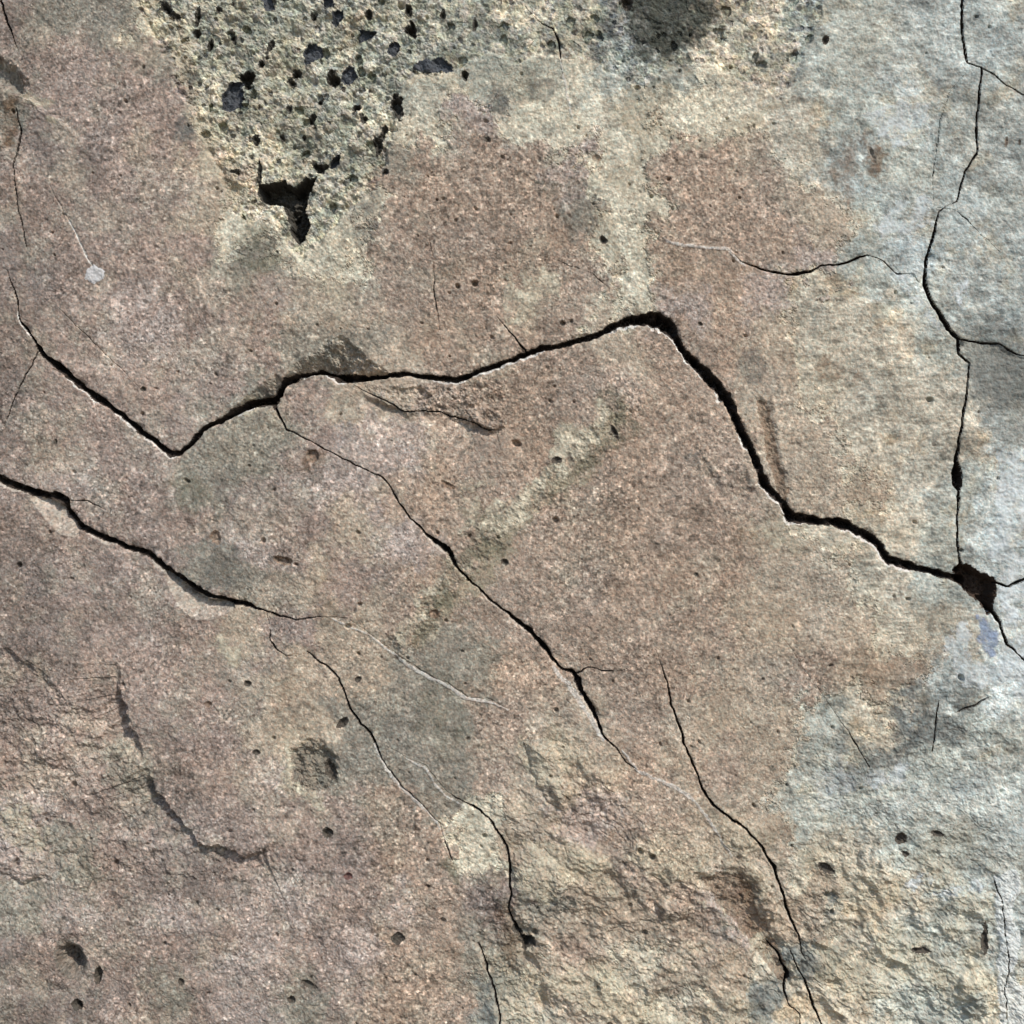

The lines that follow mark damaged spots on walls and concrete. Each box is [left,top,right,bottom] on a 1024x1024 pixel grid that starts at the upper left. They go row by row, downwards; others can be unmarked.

spalling [136,0,829,262]
crack [663,237,902,277]
crack [922,0,1024,563]
crack [0,276,954,1024]
crack [932,697,988,751]
crack [983,578,1024,661]